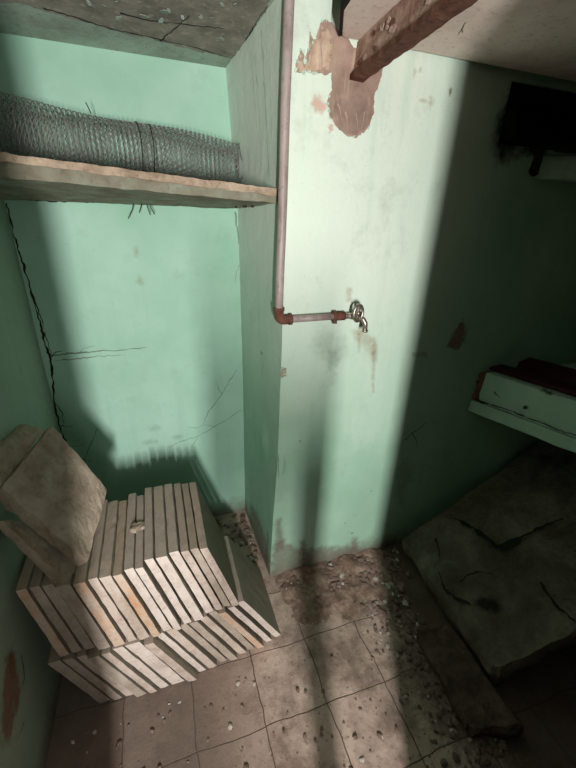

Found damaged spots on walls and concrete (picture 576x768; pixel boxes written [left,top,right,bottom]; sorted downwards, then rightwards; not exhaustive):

flaking render [294,19,383,138]
crack [6,203,146,462]
crack [435,538,499,611]
crack [454,518,563,551]
crack [539,581,576,623]
corrosion [3,653,20,736]